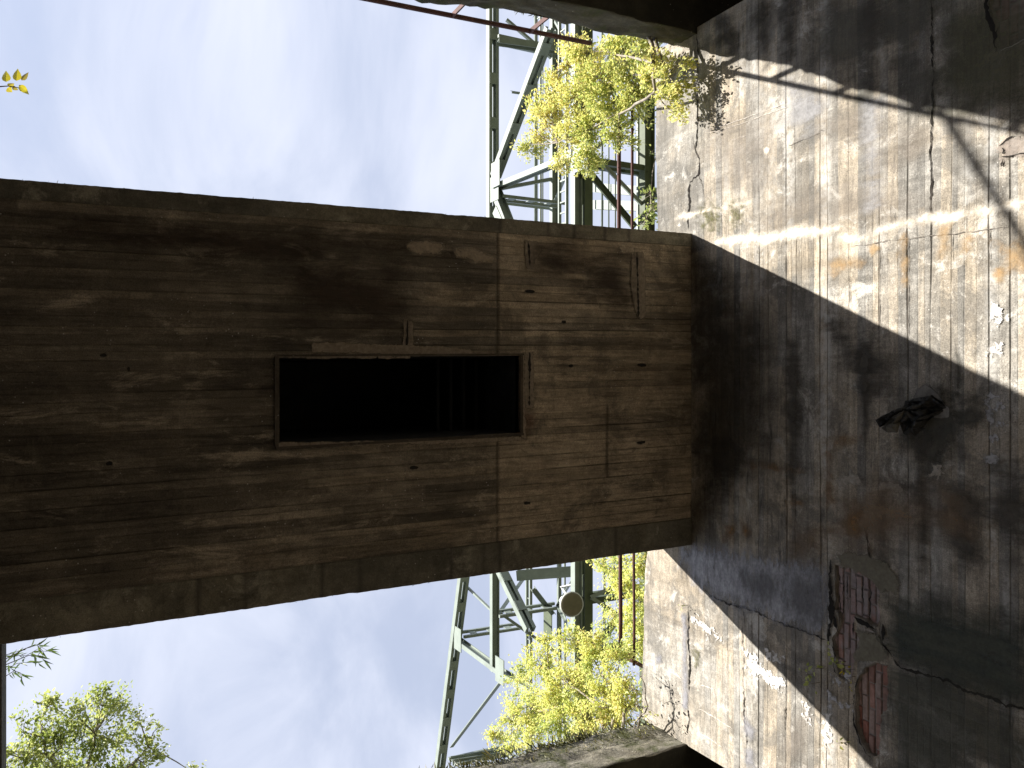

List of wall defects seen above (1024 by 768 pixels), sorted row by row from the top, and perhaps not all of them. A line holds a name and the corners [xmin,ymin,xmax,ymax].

crack [687,35,704,224]
crack [848,0,1006,337]
crack [685,615,693,731]
crack [699,581,825,760]
spalling [801,559,889,757]
crack [882,644,1024,710]